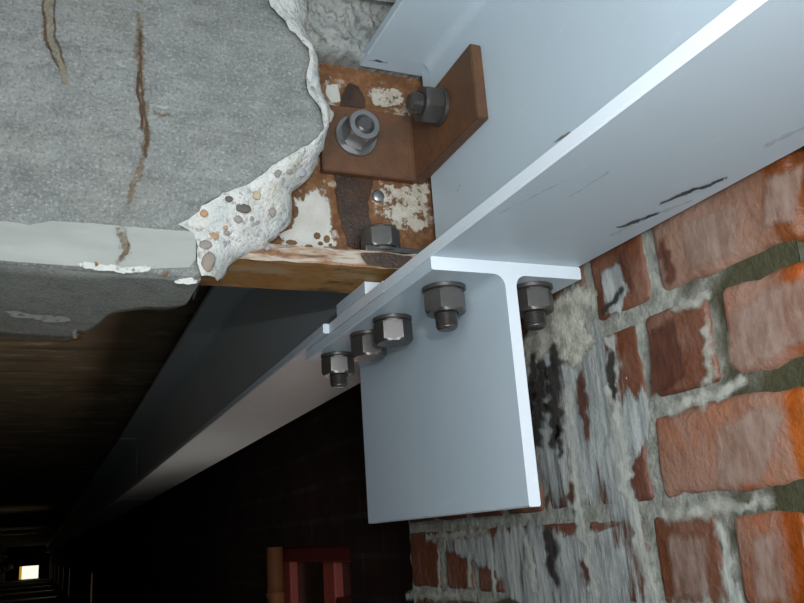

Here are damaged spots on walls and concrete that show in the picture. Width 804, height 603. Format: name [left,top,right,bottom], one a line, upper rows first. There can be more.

corrosion [340,83,366,108]
spalling [175,0,422,285]
corrosion [335,174,412,268]
efflorescence [764,167,802,225]
peeling [77,262,152,274]
damp [658,239,675,284]
efflorescence [729,279,804,366]
damp [406,250,711,603]
damp [667,375,745,416]
damp [660,407,781,603]
efflorescence [753,534,786,601]